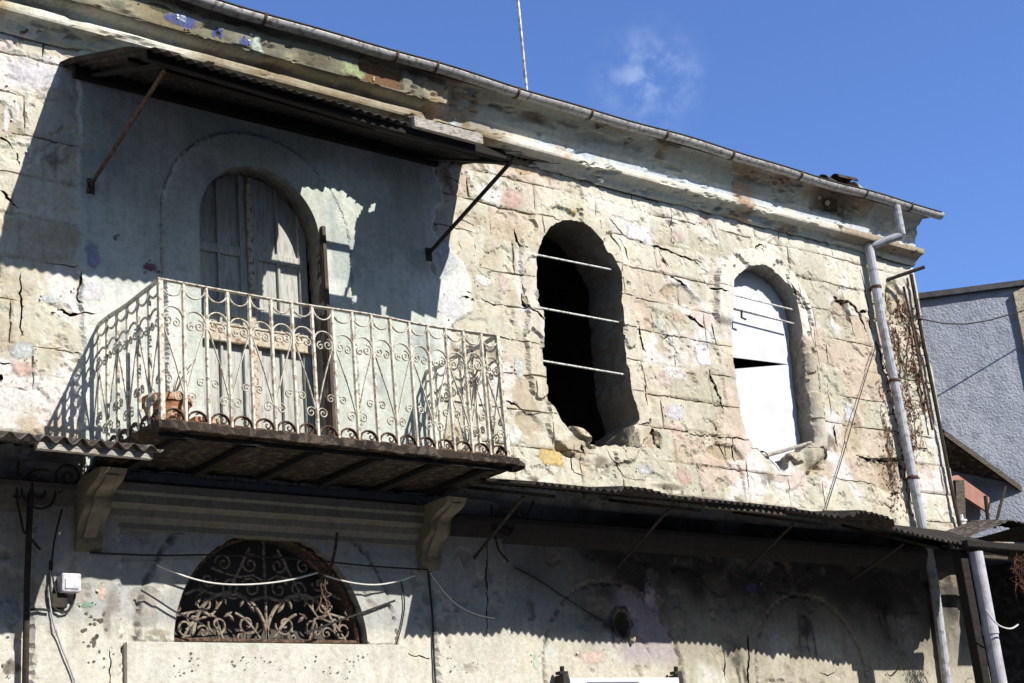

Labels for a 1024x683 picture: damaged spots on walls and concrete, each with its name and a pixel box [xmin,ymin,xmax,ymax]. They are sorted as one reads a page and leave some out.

peeling [240,33,263,58]
peeling [341,62,375,81]
crack [610,193,728,292]
crack [16,276,24,337]
crack [52,273,95,317]
crack [481,294,545,319]
crack [638,314,717,449]
crack [791,283,838,446]
peeling [509,425,521,448]
peeling [539,448,564,467]
crack [688,374,780,488]
crack [482,538,490,634]